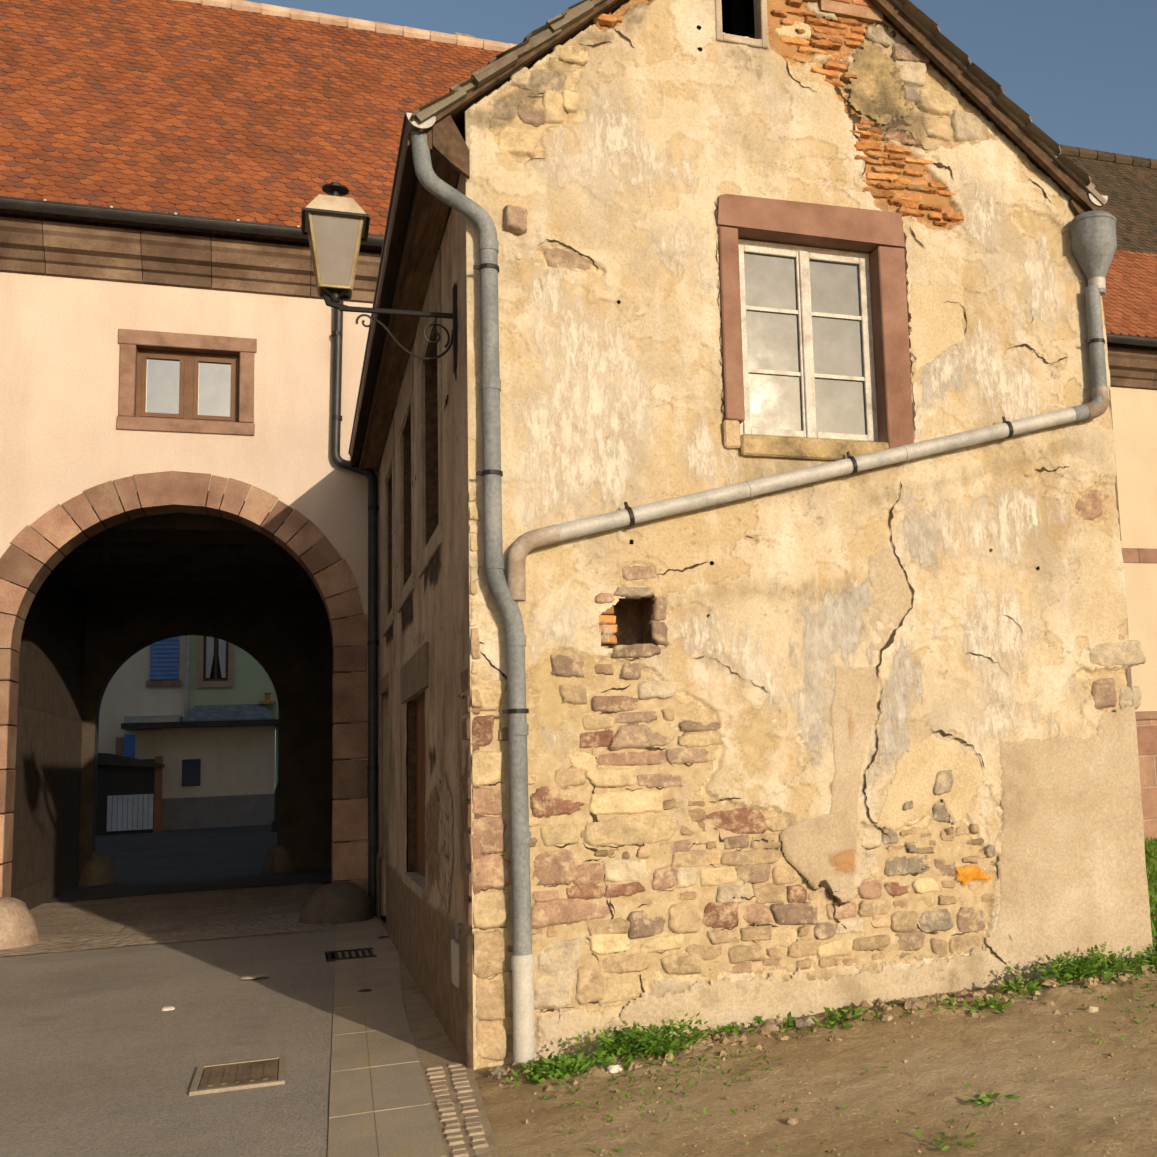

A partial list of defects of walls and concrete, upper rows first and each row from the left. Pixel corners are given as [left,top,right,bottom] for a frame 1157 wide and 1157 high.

spalling [767,0,1074,332]
spalling [425,490,513,1069]
peeling [515,244,652,526]
crack [661,562,707,575]
peeling [681,420,740,480]
spalling [526,561,1002,1021]
crack [863,481,915,838]
crack [930,728,986,770]
crack [1008,288,1067,365]